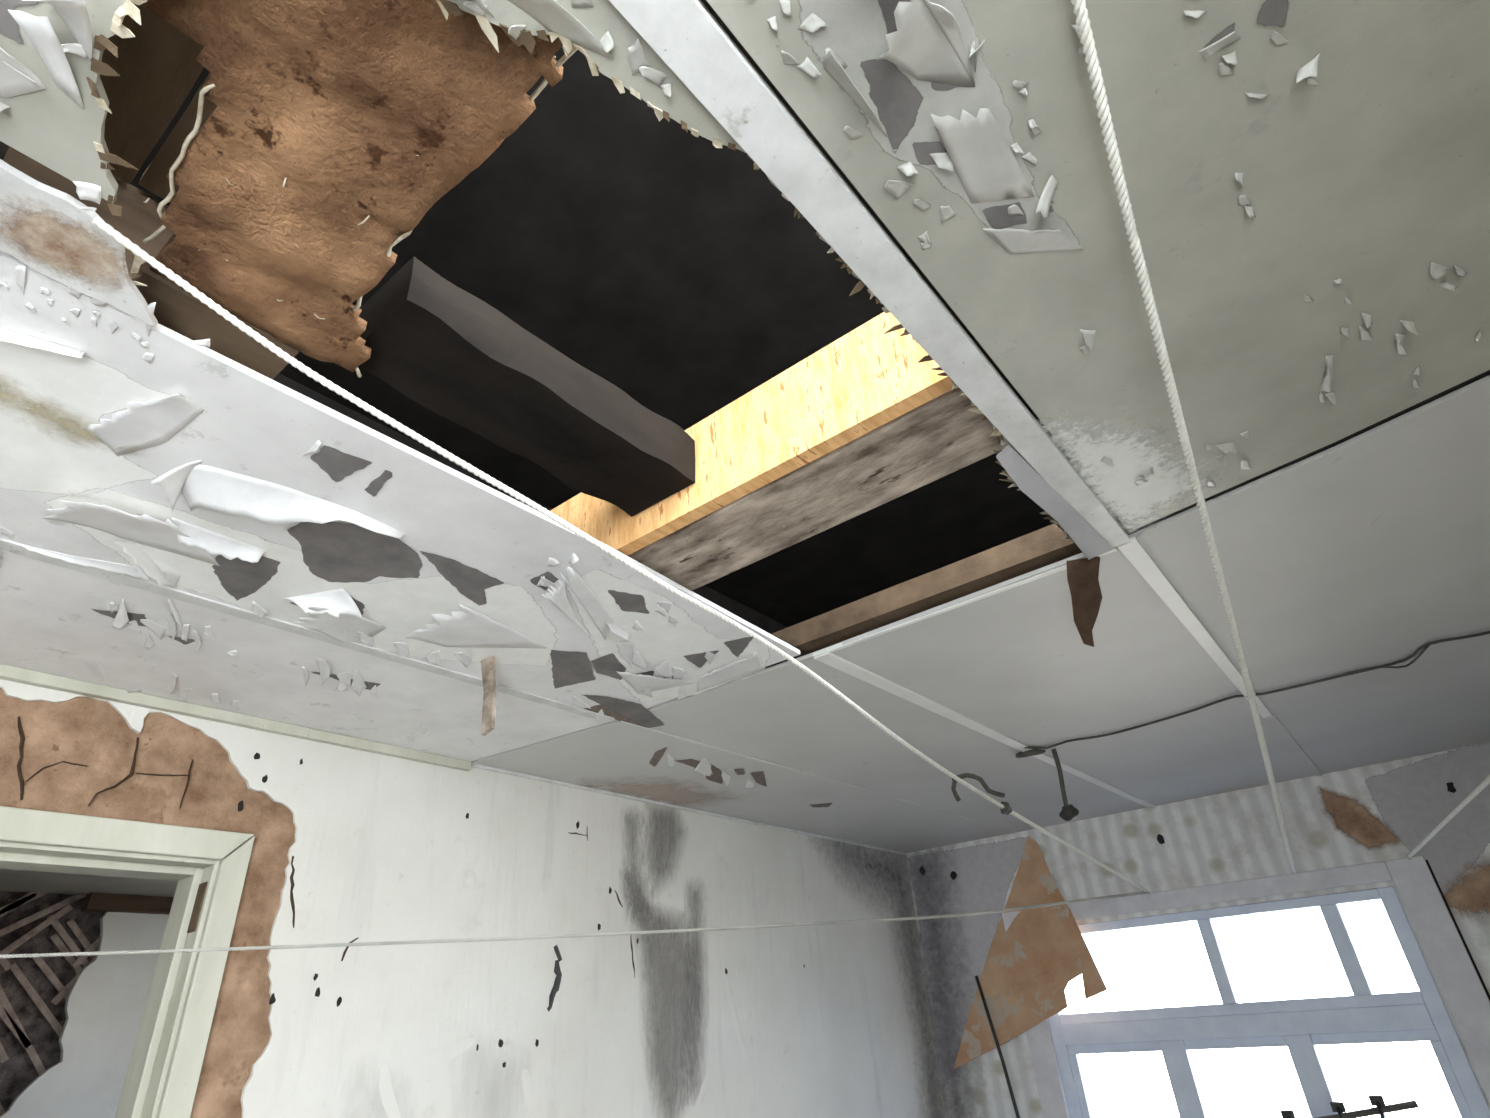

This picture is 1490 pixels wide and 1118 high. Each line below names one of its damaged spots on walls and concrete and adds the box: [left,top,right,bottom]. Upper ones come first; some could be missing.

peeling [0,0,92,112]
peeling [73,181,101,211]
peeling [507,0,672,98]
peeling [767,0,1084,254]
peeling [0,328,770,728]
peeling [1042,420,1216,532]
crack [17,716,194,809]
spalling [0,688,295,1118]
damp [631,826,700,1118]
damp [652,810,681,878]
damp [834,841,969,1118]
flaking render [908,836,1029,1090]